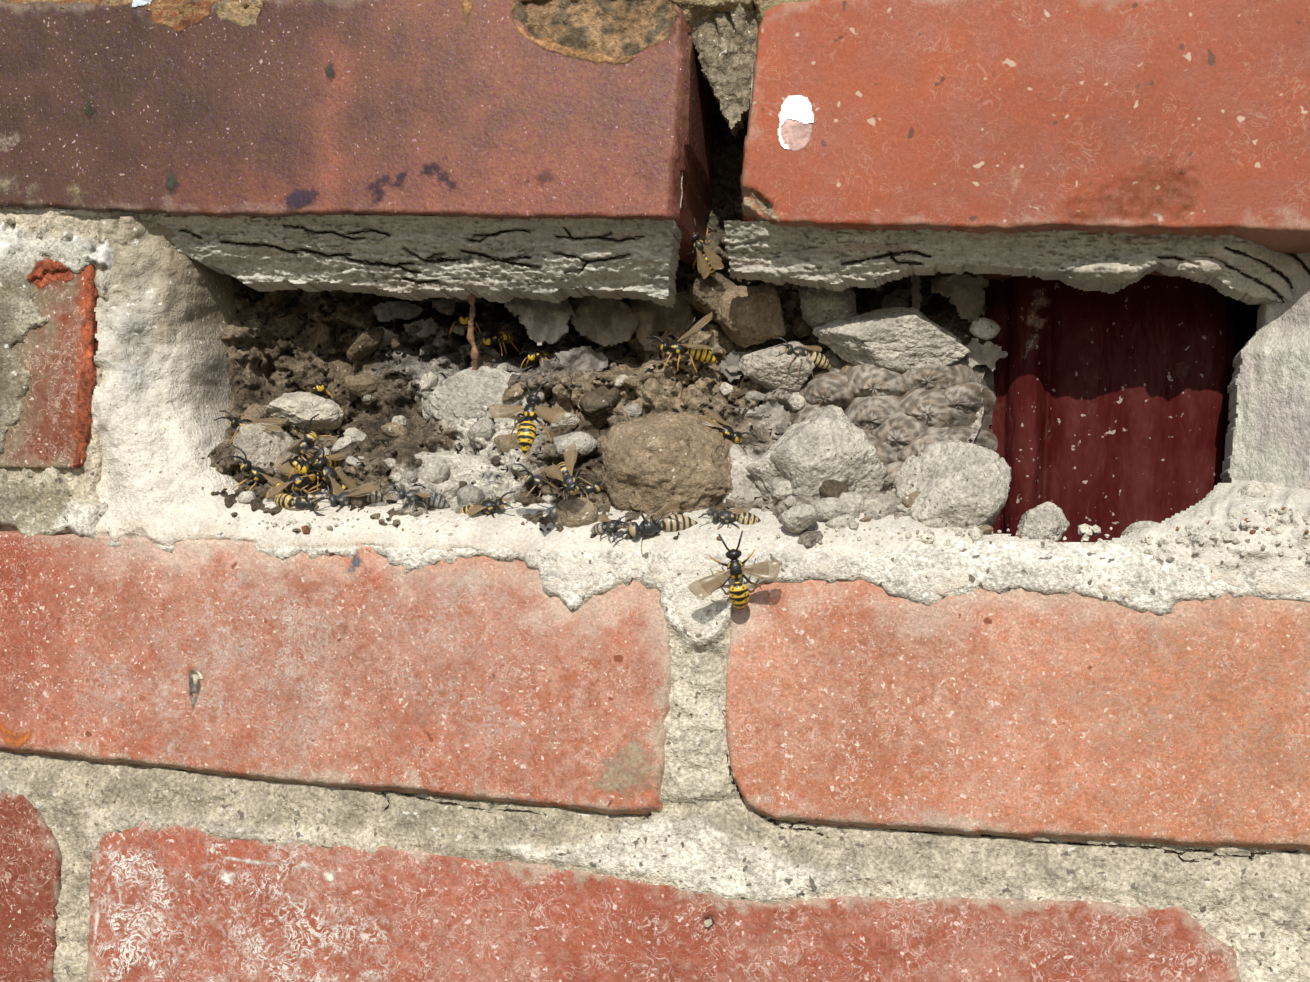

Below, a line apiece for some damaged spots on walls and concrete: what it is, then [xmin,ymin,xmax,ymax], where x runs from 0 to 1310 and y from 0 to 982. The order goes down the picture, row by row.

spalling [512,0,679,63]
spalling [741,185,778,225]
peeling [0,221,19,259]
crack [180,225,642,284]
crack [841,250,931,265]
spalling [27,230,115,468]